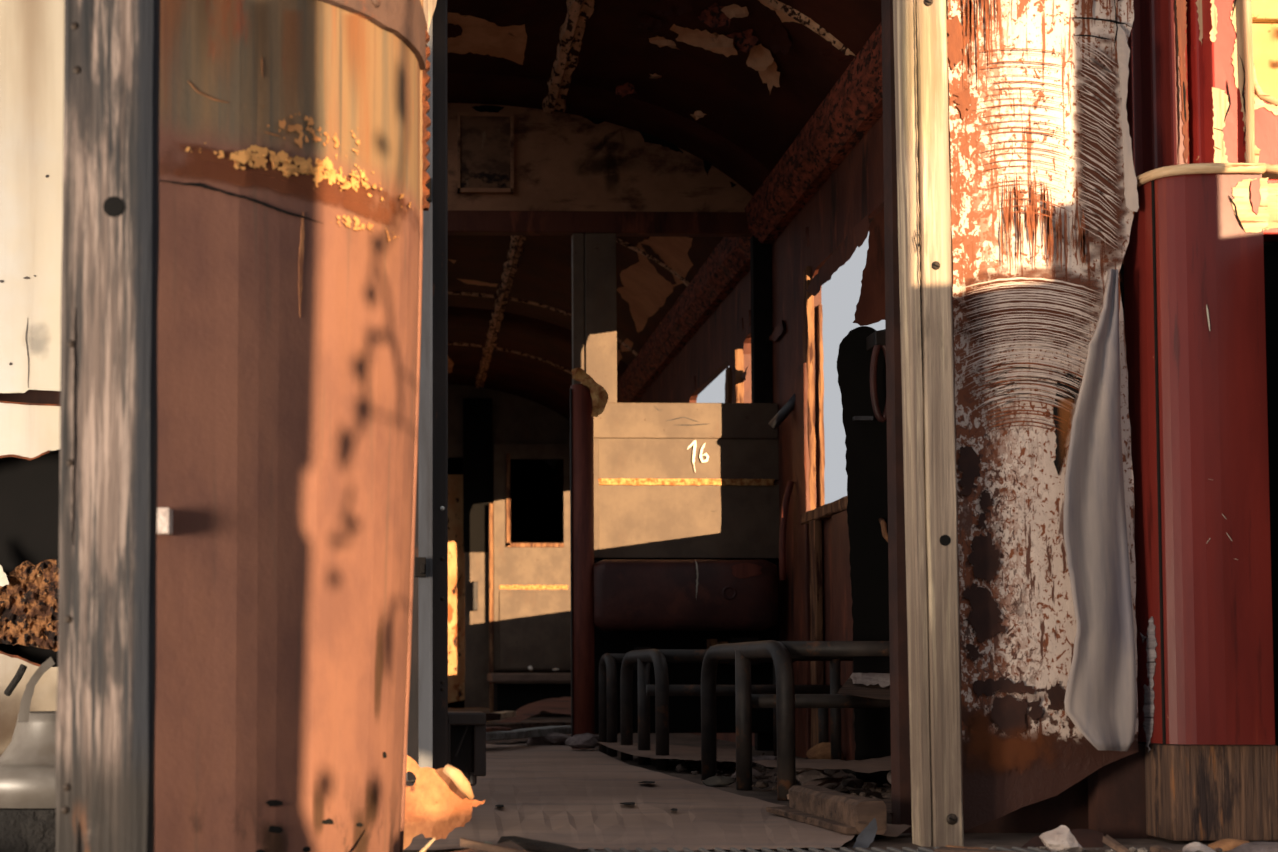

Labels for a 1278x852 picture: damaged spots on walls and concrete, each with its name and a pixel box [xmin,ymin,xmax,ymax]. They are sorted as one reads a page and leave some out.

peeling [448,12,527,65]
peeling [637,0,816,93]
peeling [947,15,968,70]
peeling [954,87,972,119]
peeling [1175,0,1278,164]
corrosion [173,113,414,242]
peeling [1229,177,1278,233]
peeling [958,442,1006,661]
peeling [969,269,1158,752]